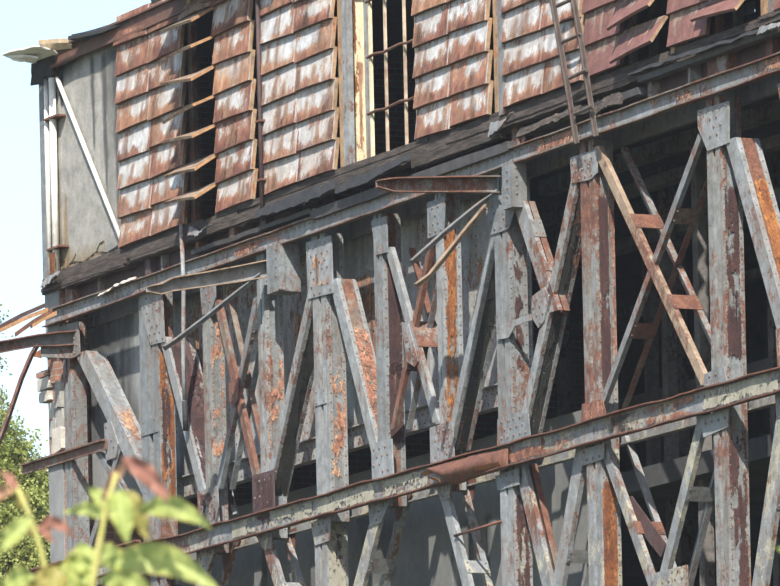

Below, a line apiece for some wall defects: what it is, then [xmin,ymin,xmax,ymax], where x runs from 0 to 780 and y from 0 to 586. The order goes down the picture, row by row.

rust [353,0,364,148]
rust [159,310,225,496]
rust [267,340,284,421]
rust [331,367,354,477]
rust [354,277,378,428]
rust [387,265,405,444]
rust [444,230,458,421]
rust [724,186,742,359]
rust [755,179,780,275]
rust [200,493,215,519]
rust [602,480,619,586]